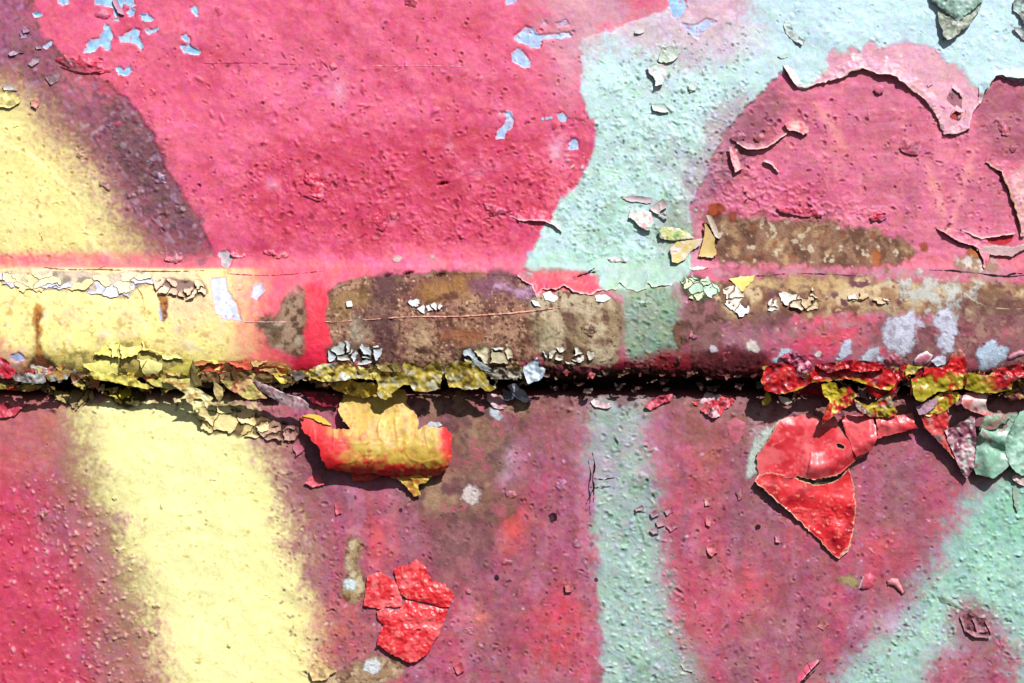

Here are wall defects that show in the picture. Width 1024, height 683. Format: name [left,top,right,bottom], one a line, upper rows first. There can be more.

peeling [83,0,159,54]
peeling [495,110,514,140]
peeling [511,20,572,68]
peeling [729,118,809,172]
peeling [778,53,1024,134]
rust [250,285,306,376]
rust [326,270,625,369]
peeling [510,195,756,317]
rust [673,203,1024,378]
peeling [937,160,1024,268]
peeling [0,338,1024,558]
peeling [363,559,454,663]